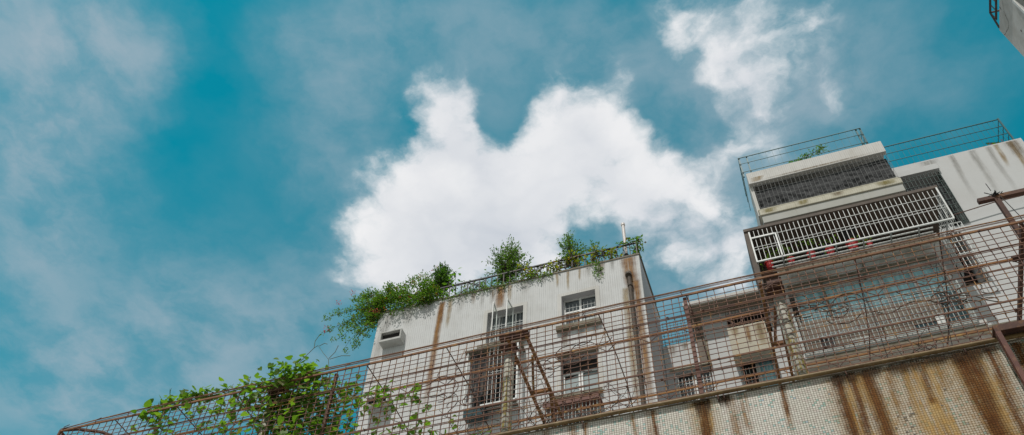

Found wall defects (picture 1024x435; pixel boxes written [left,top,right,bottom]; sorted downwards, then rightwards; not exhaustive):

corrosion [428,302,451,380]
corrosion [623,257,649,379]
corrosion [690,395,749,435]
corrosion [827,347,1024,435]
corrosion [1010,342,1024,368]